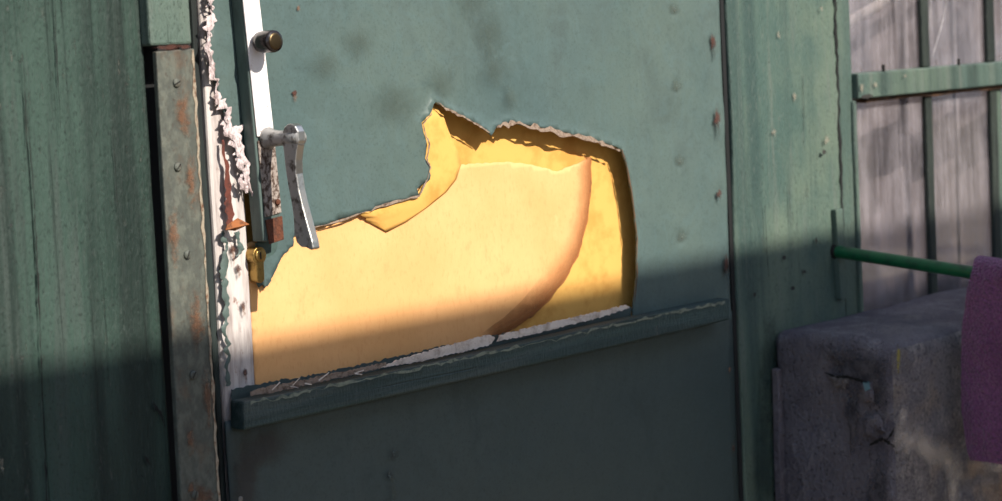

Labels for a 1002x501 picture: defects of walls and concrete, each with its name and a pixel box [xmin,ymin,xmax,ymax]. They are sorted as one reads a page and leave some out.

peeling [202,0,253,195]
crack [834,0,845,227]